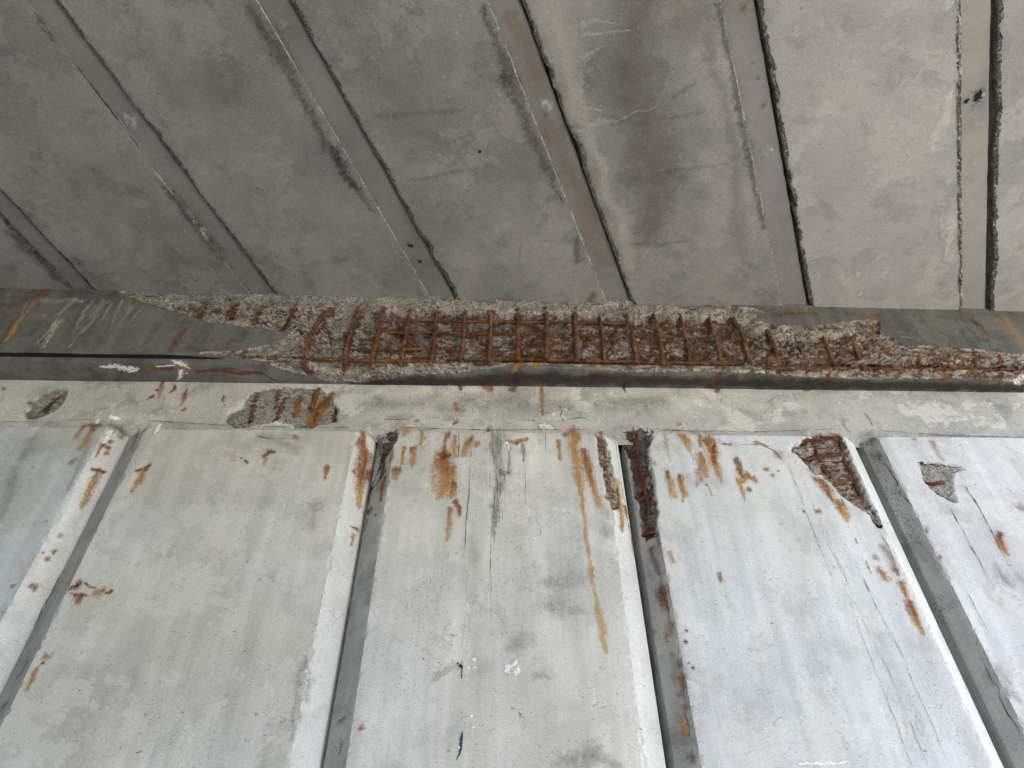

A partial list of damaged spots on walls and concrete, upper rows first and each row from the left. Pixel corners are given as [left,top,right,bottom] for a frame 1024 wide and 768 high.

spalling [56,0,1024,429]
spalling [24,386,67,420]
rust [74,423,123,507]
rust [350,420,425,545]
rust [432,385,481,541]
rust [556,426,608,653]
spalling [622,426,659,541]
rust [666,433,725,502]
rust [734,455,780,500]
spalling [791,431,921,544]
rust [866,555,925,635]
spalling [917,461,961,503]